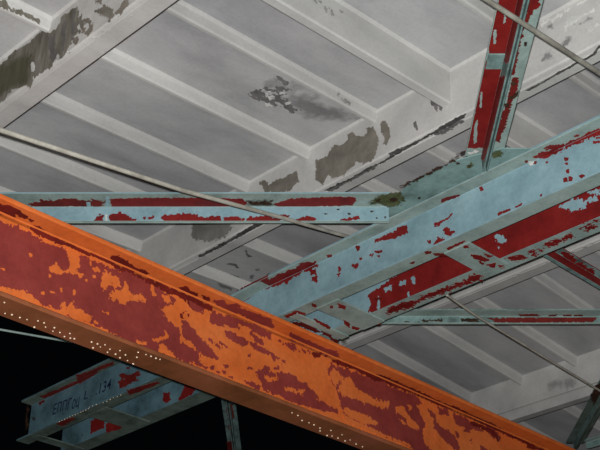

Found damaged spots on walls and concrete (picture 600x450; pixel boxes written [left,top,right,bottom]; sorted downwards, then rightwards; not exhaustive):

spalling [0,0,41,25]
peeling [72,0,129,45]
peeling [247,75,301,113]
peeling [468,0,541,161]
peeling [315,121,391,185]
peeling [525,128,600,182]
peeling [28,171,360,221]
peeling [359,186,600,315]
peeling [0,203,544,450]
peeling [487,314,598,323]